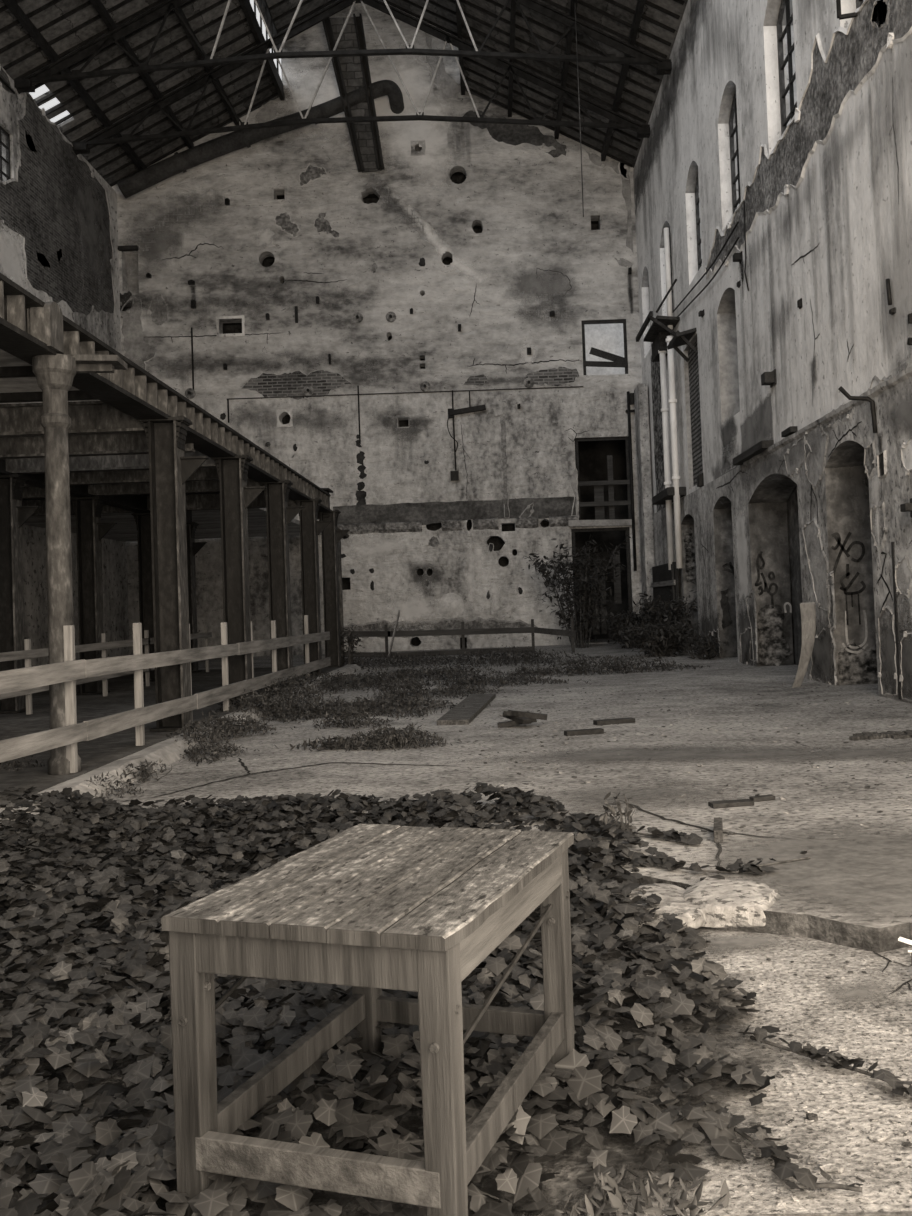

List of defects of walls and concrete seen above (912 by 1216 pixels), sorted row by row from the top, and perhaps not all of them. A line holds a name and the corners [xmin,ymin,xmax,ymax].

flaking render [424,33,635,270]
flaking render [705,0,912,278]
flaking render [0,66,170,371]
peeling [270,163,340,240]
crack [162,243,224,260]
spalling [254,247,284,284]
leakage [515,268,575,322]
flaking render [239,368,354,427]
flaking render [520,365,581,389]
peeling [870,501,887,554]
flaking render [802,517,912,704]